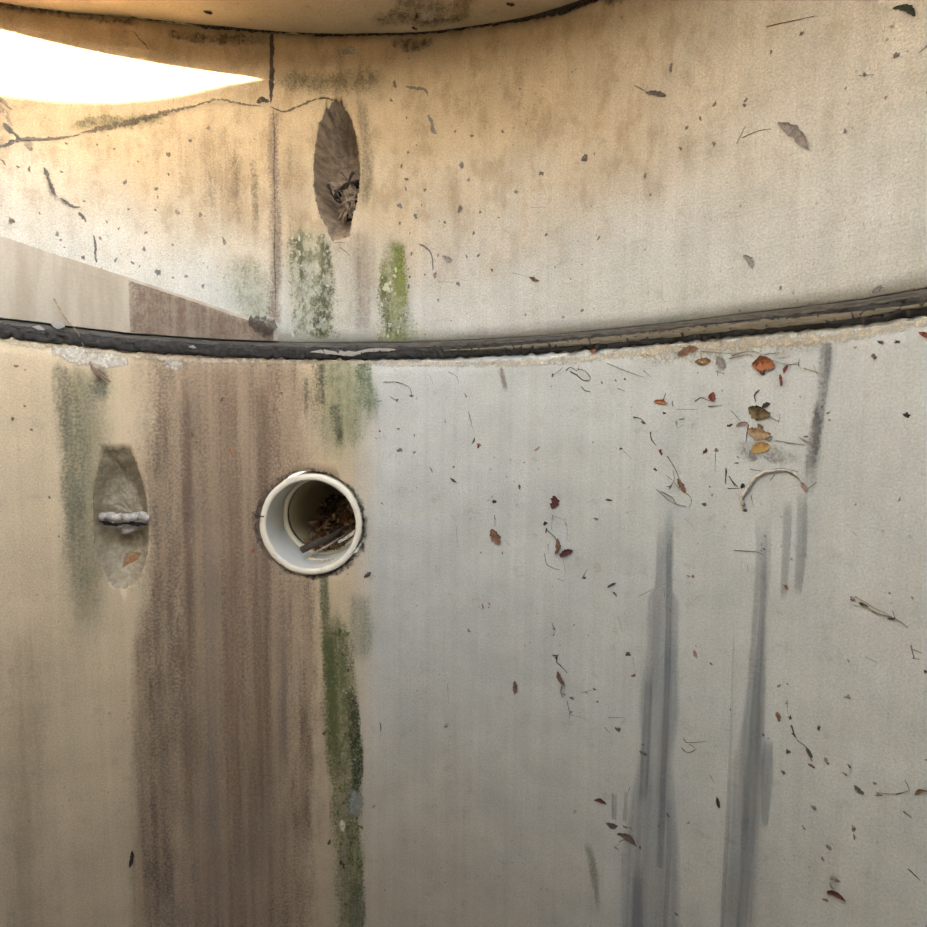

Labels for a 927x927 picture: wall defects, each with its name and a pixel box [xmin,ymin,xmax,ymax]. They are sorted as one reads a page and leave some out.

crack [0,0,613,262]
damp [837,319,927,342]
damp [1,334,830,927]